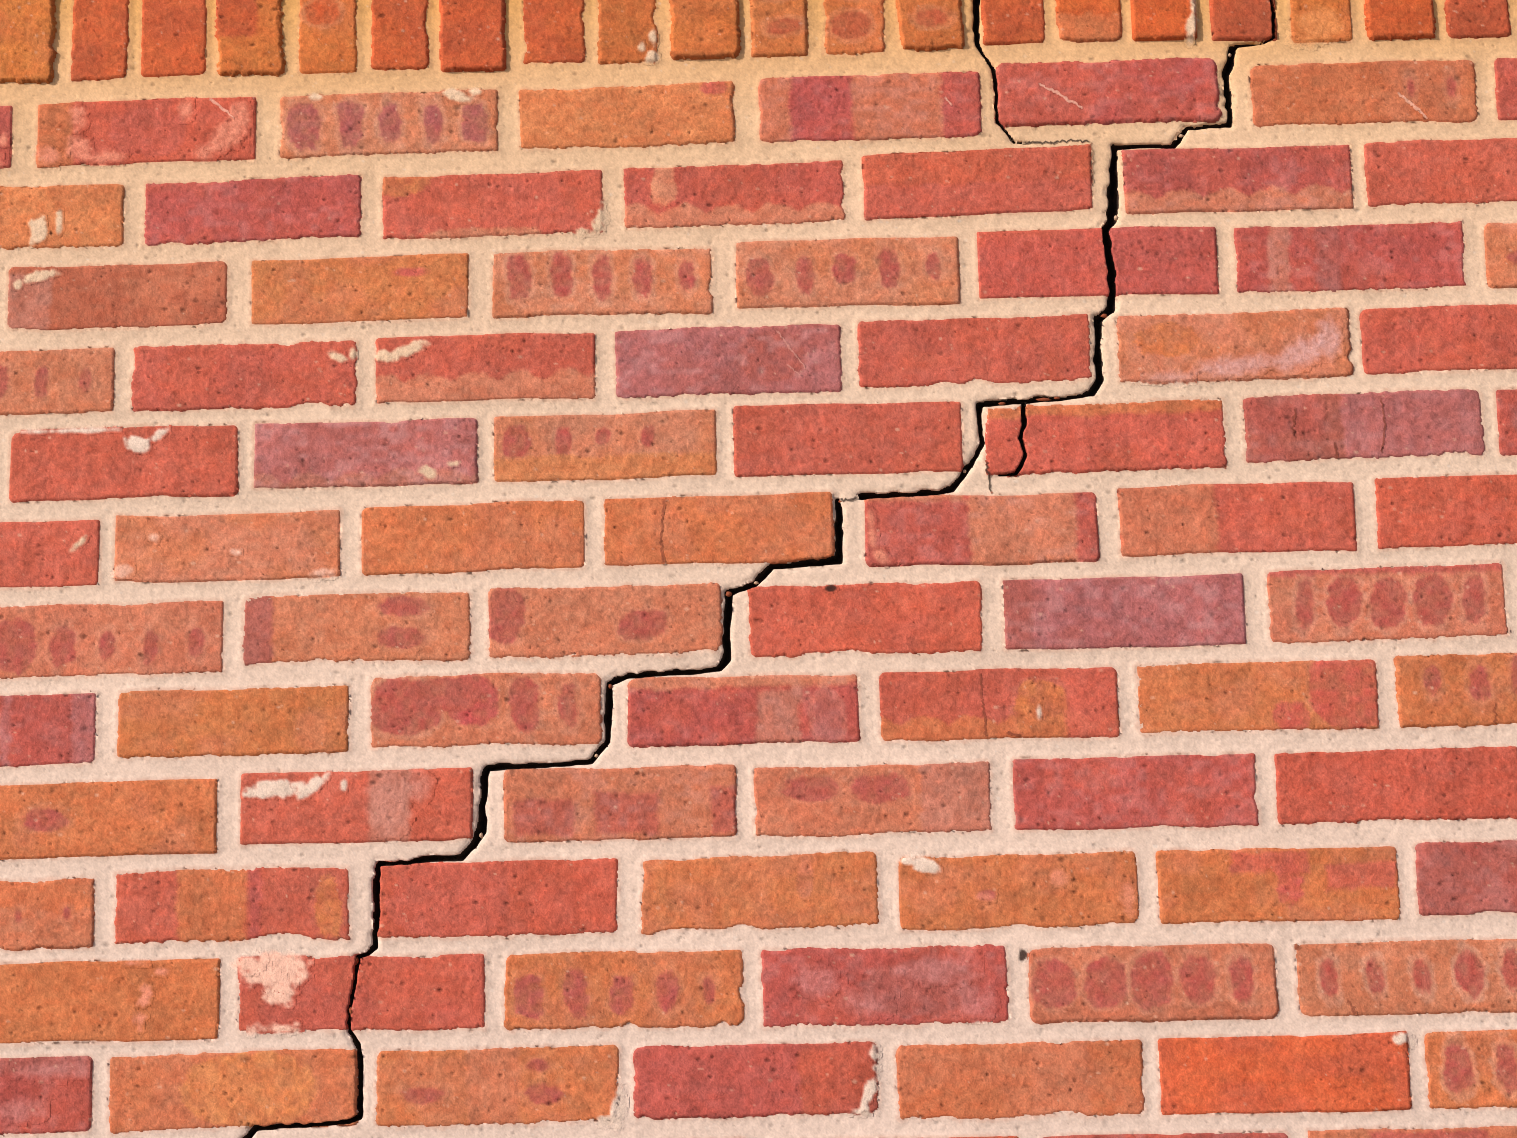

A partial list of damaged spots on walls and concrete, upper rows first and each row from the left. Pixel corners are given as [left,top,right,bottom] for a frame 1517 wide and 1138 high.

crack [242,0,1275,1138]
crack [1346,997,1357,1015]